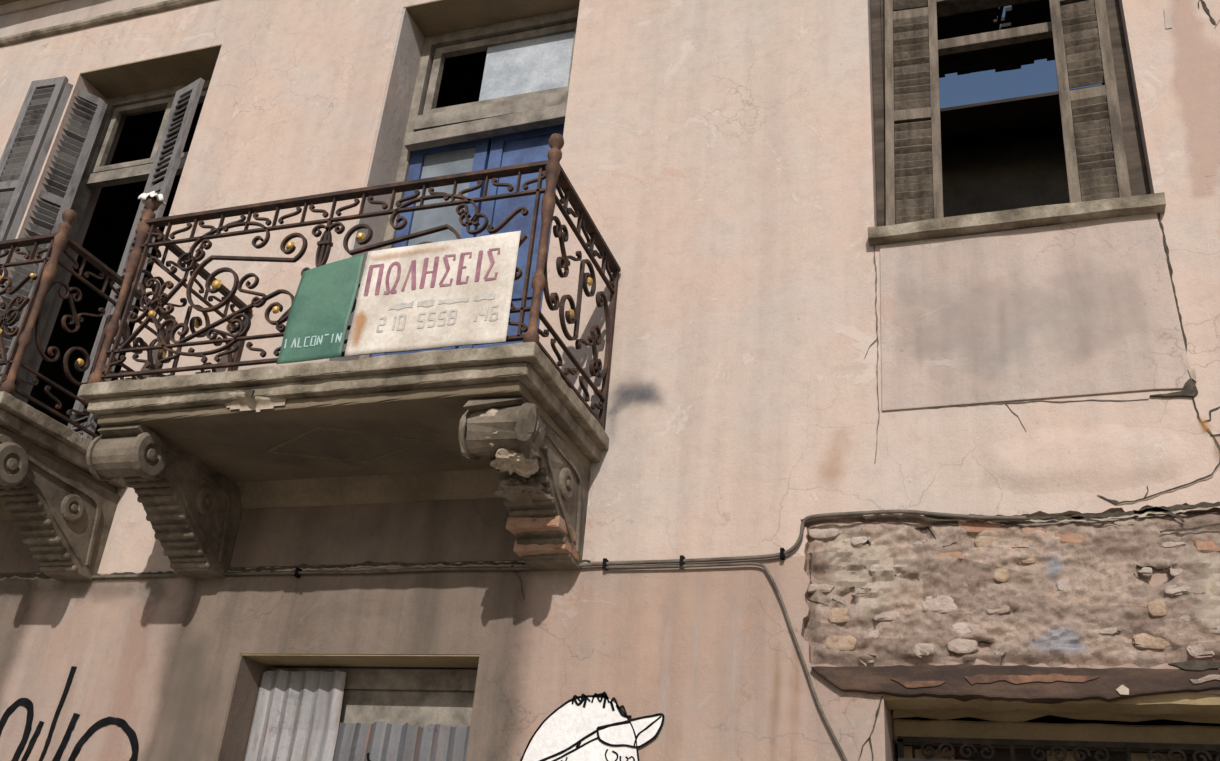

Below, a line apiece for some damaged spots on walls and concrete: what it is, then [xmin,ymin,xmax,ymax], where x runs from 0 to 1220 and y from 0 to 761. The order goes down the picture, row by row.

crack [1198,0,1220,28]
crack [864,245,880,463]
crack [1158,213,1190,367]
flaking render [486,431,580,561]
crack [924,397,1220,533]
spalling [804,508,1220,668]